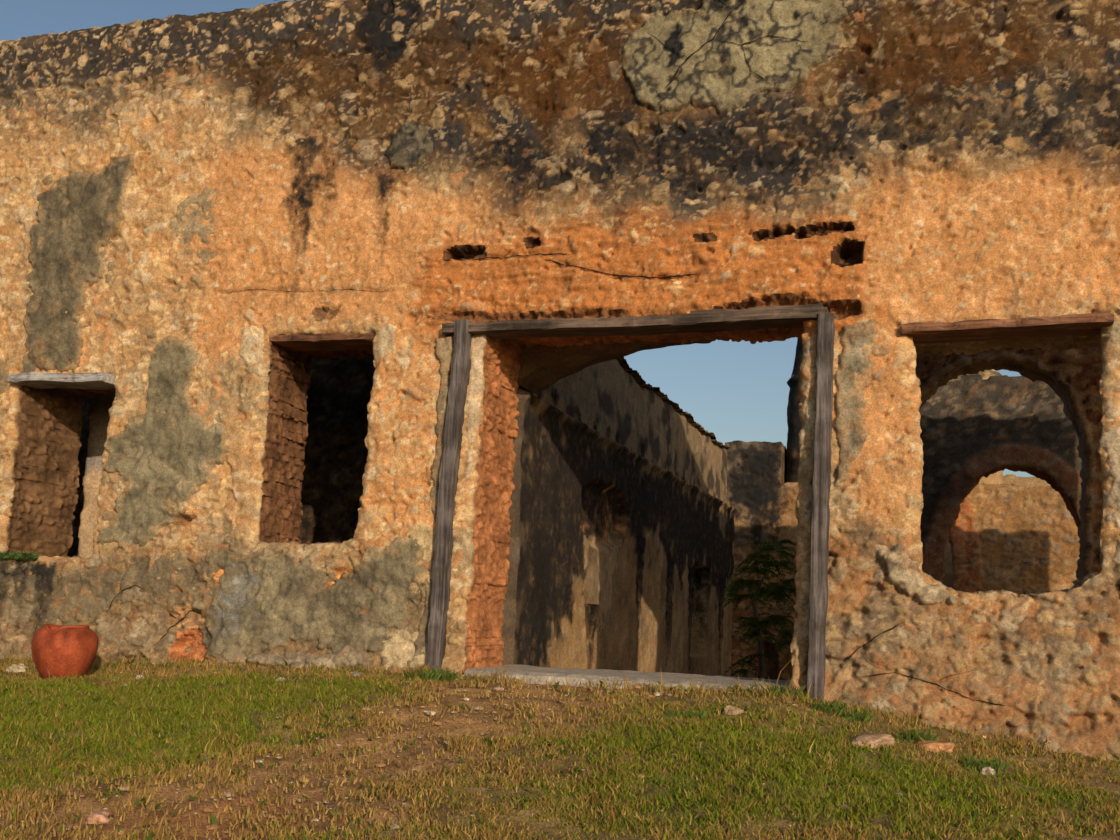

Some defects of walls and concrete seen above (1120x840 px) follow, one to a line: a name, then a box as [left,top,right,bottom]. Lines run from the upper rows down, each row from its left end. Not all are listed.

crack [649,0,806,88]
water stain [287,137,334,249]
water stain [473,107,869,194]
water stain [867,108,932,156]
water stain [989,109,1069,147]
water stain [1081,77,1120,149]
water stain [515,338,803,668]